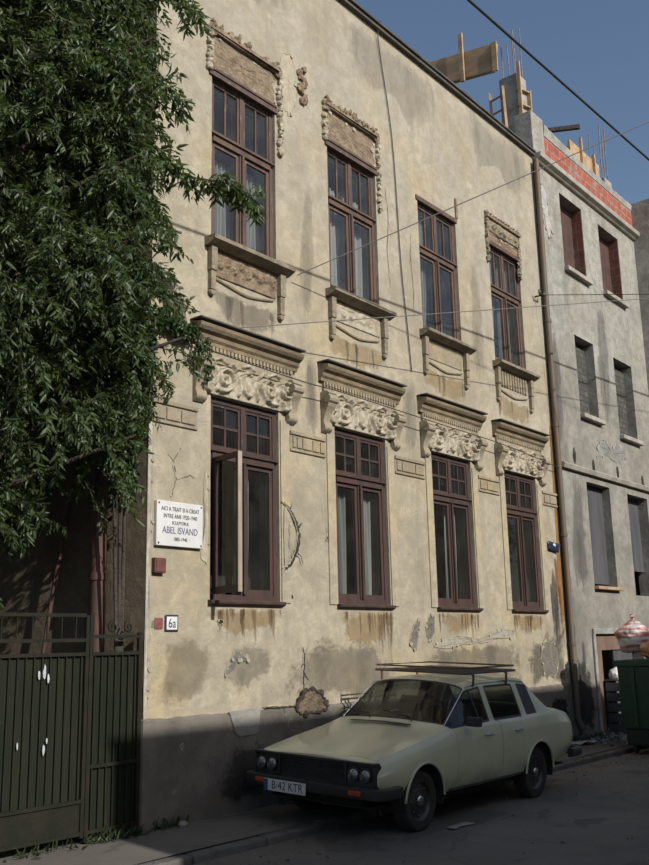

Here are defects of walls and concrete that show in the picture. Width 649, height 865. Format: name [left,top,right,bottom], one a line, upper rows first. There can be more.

crack [168,446,195,497]
crack [281,501,303,570]
damp [550,573,565,680]
peeling [224,650,250,677]
damp [529,645,544,683]
spalling [295,686,330,718]